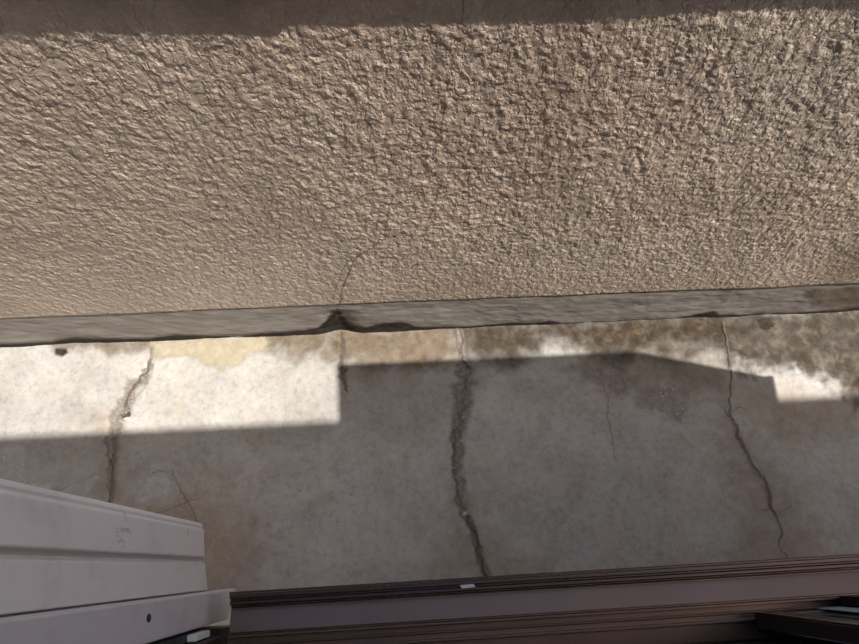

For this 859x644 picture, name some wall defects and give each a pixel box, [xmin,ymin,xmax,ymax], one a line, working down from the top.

crack [0,197,859,577]
damp [269,311,859,399]